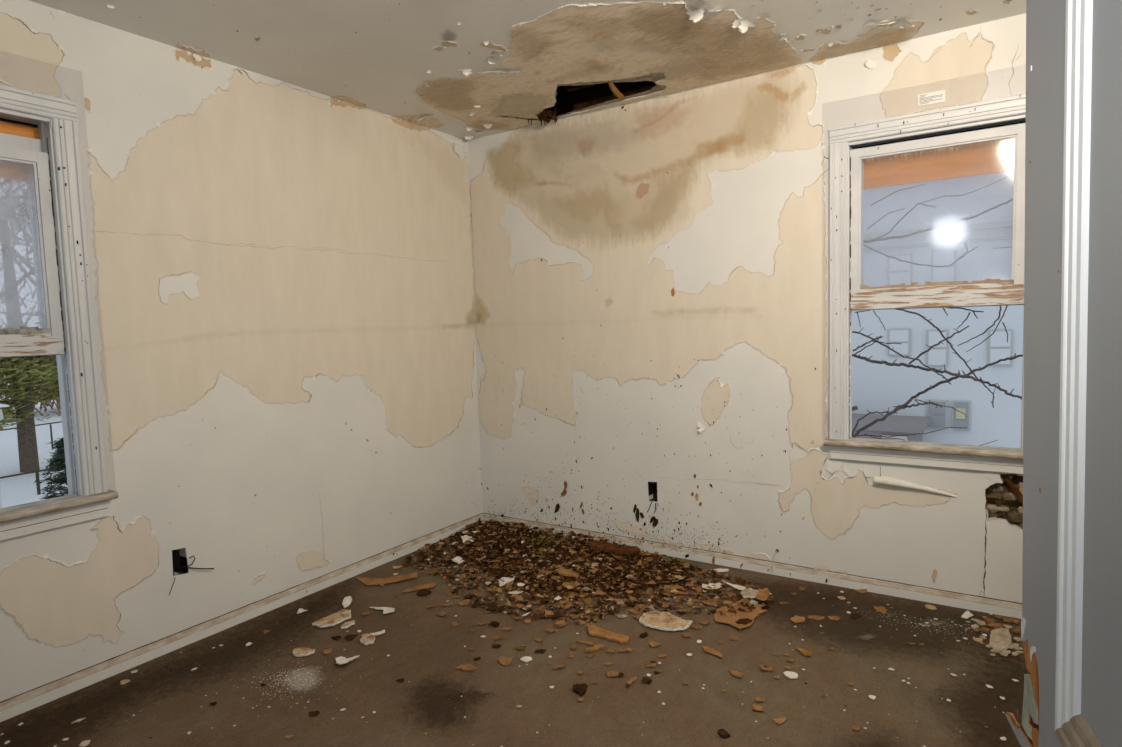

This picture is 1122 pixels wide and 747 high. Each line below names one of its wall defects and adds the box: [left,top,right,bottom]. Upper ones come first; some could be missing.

peeling [0,11,66,98]
peeling [86,0,996,540]
hole [981,471,1023,529]
peeling [0,514,161,648]